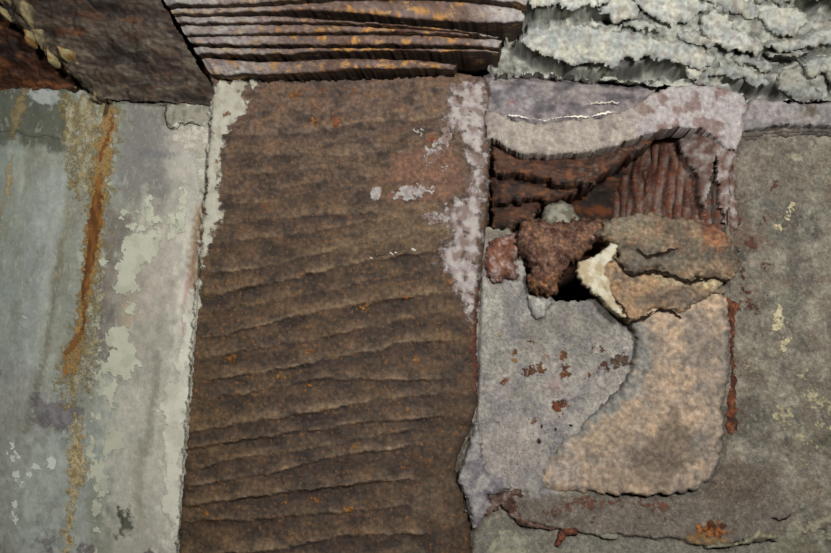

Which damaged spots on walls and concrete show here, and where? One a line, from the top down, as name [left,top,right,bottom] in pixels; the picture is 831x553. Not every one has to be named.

leakage [424,81,491,328]
rust [488,136,656,233]
rust [52,87,132,410]
peeling [98,182,189,316]
peeling [575,243,626,318]
peeling [95,326,143,409]
rust [511,349,547,377]
rust [550,399,570,415]
rust [556,351,572,378]
rust [588,345,630,378]
peeling [84,431,125,534]
rust [686,519,734,545]